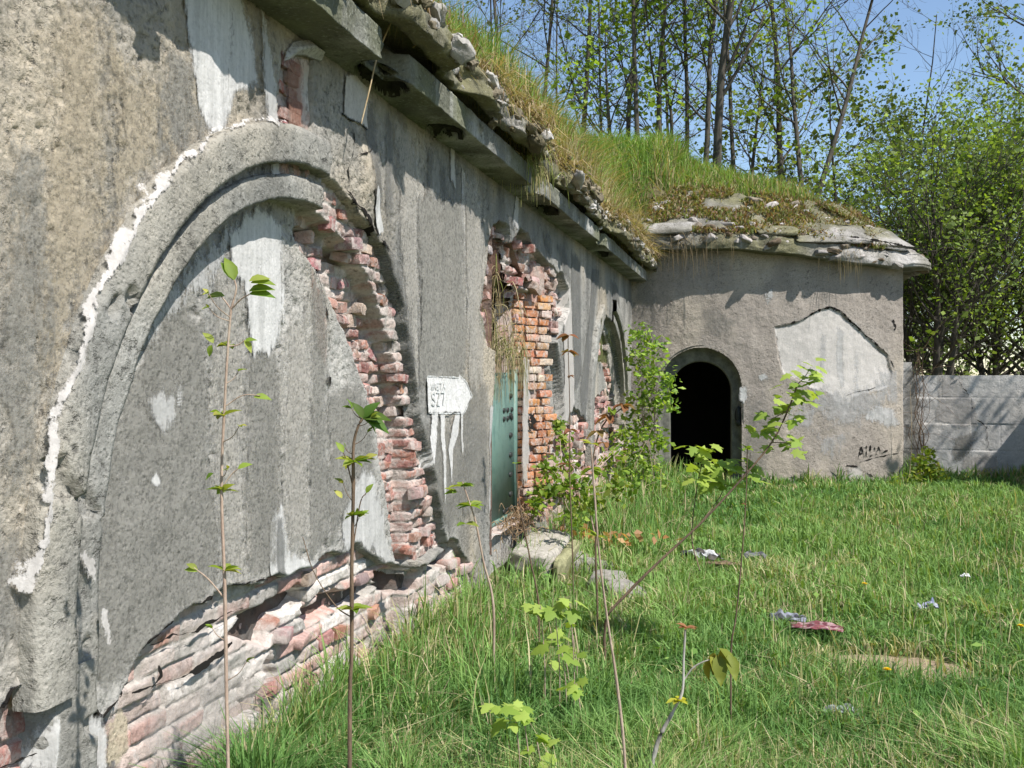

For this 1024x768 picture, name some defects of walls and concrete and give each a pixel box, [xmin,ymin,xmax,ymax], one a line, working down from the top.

peeling [277,50,310,130]
spalling [480,226,562,343]
peeling [774,306,891,407]
crack [774,306,895,368]
spalling [89,182,474,768]
spalling [544,343,627,529]